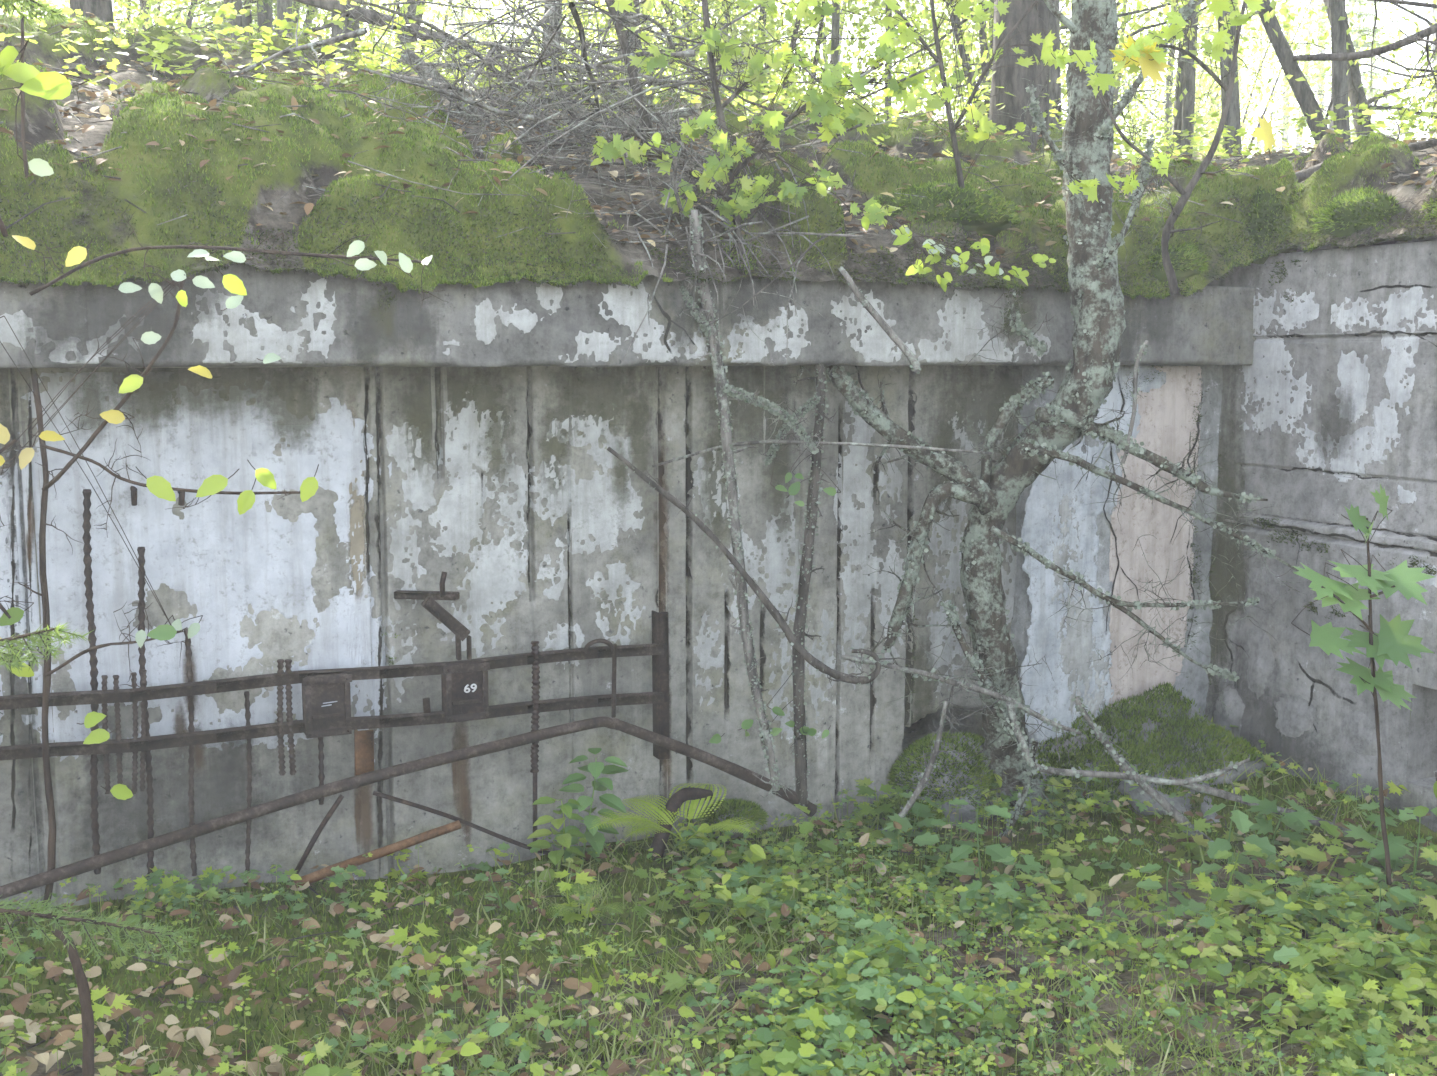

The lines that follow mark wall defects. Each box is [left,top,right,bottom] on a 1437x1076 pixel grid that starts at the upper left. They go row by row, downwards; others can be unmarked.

peeling [191,278,337,363]
peeling [474,282,563,345]
peeling [559,281,811,363]
peeling [1239,286,1437,483]
peeling [0,310,646,762]
spalling [1050,366,1202,720]
peeling [1397,485,1417,504]